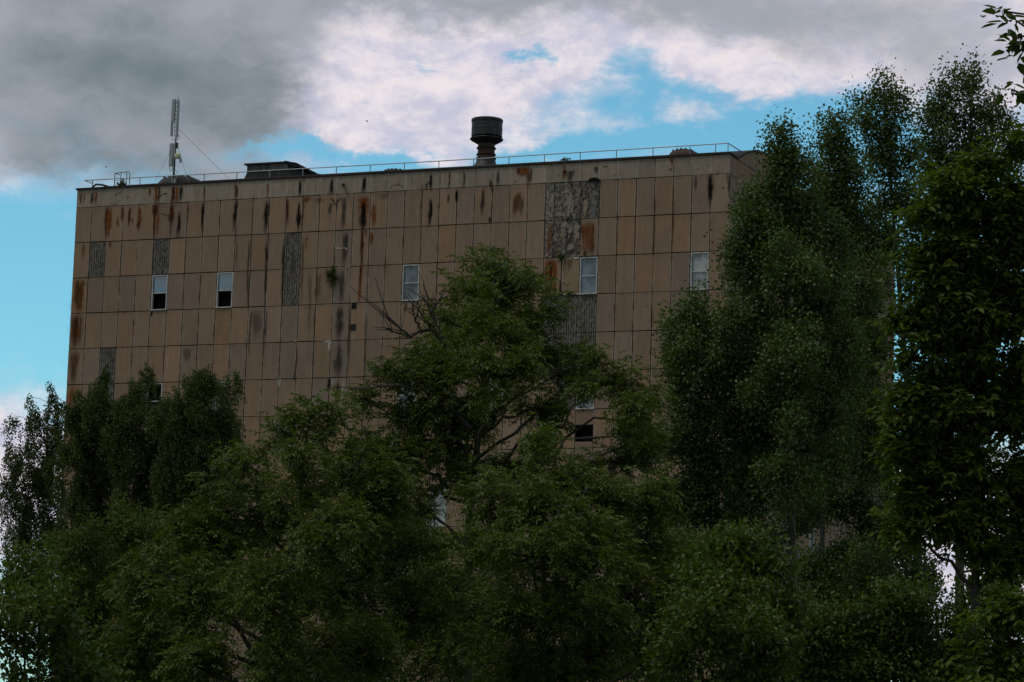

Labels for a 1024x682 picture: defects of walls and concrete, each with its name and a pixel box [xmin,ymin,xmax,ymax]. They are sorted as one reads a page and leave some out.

rust [105,187,189,247]
rust [358,198,376,298]
spalling [544,181,600,259]